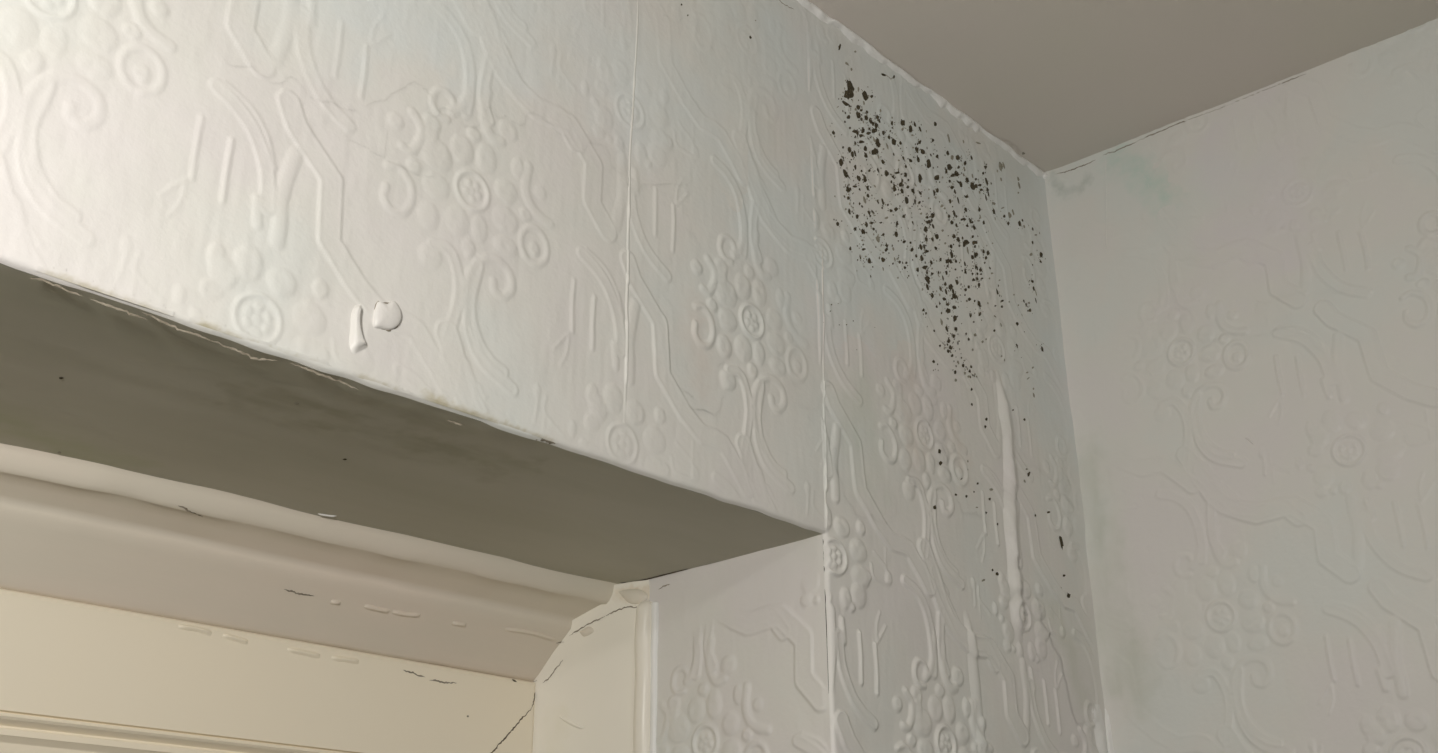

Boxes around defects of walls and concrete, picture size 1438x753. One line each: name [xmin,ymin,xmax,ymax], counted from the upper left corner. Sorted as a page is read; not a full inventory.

water stain [201,0,1351,729]